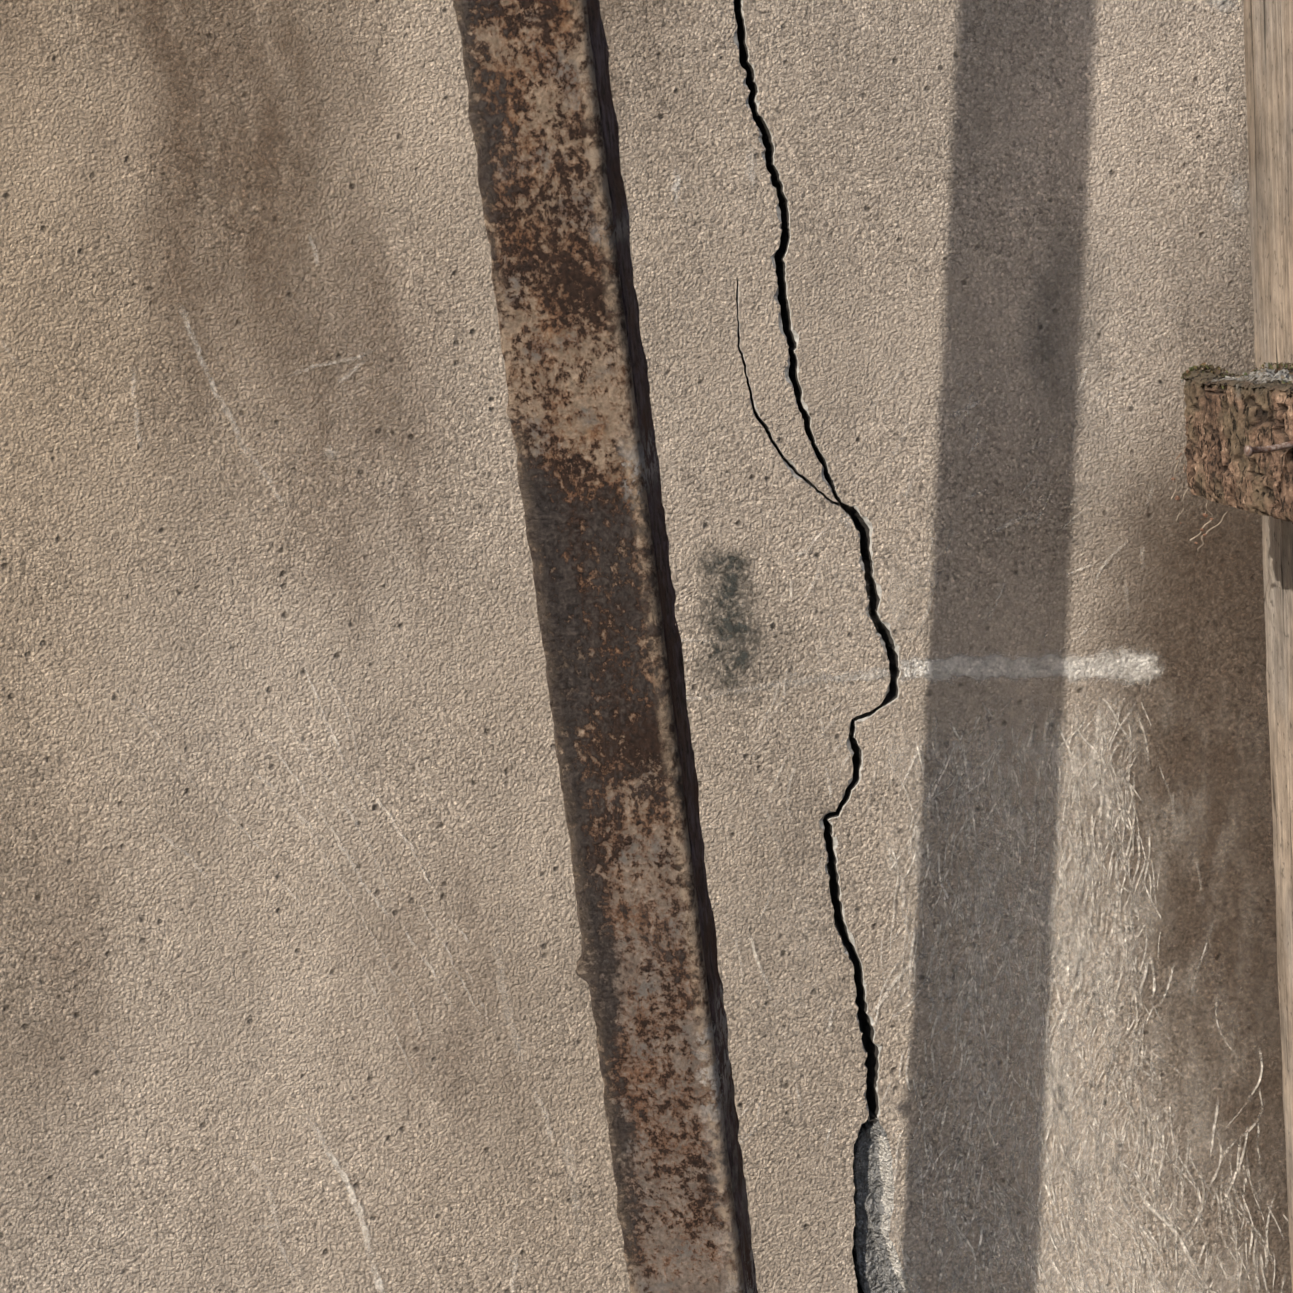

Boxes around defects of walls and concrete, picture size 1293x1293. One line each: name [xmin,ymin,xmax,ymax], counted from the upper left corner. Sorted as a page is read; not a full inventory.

mould [701,555,759,685]
crack [733,0,901,1121]
spalling [852,1107,912,1293]
water stain [875,495,1292,1293]